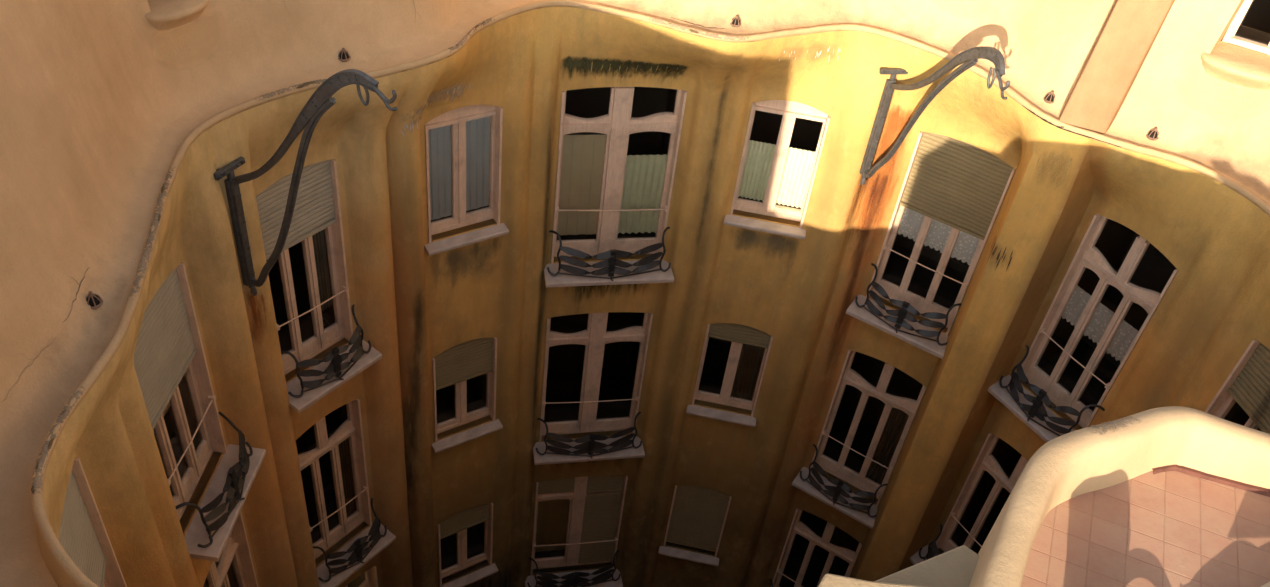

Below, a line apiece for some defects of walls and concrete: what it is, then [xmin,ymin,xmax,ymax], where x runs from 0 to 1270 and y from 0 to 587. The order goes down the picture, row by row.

rust [847,107,910,238]